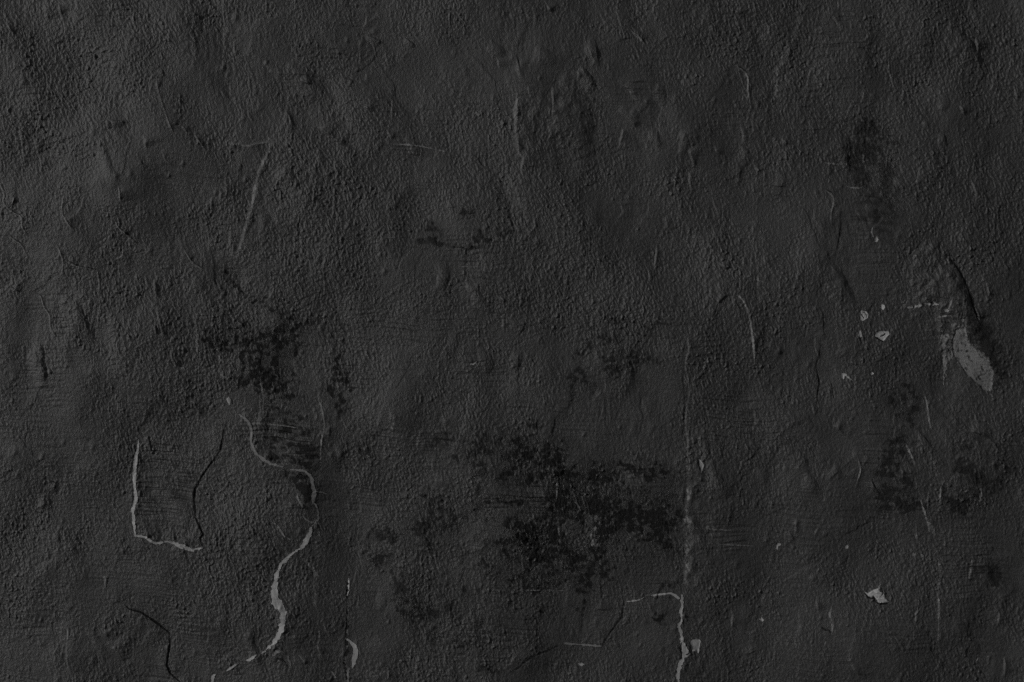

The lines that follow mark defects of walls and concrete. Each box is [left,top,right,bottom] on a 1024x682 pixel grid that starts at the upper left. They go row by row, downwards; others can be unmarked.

peeling [875,331,889,342]
spalling [907,300,993,397]
crack [193,425,226,546]
water stain [429,421,698,619]
water stain [369,526,453,651]
crack [514,599,624,670]
peeling [864,585,889,605]